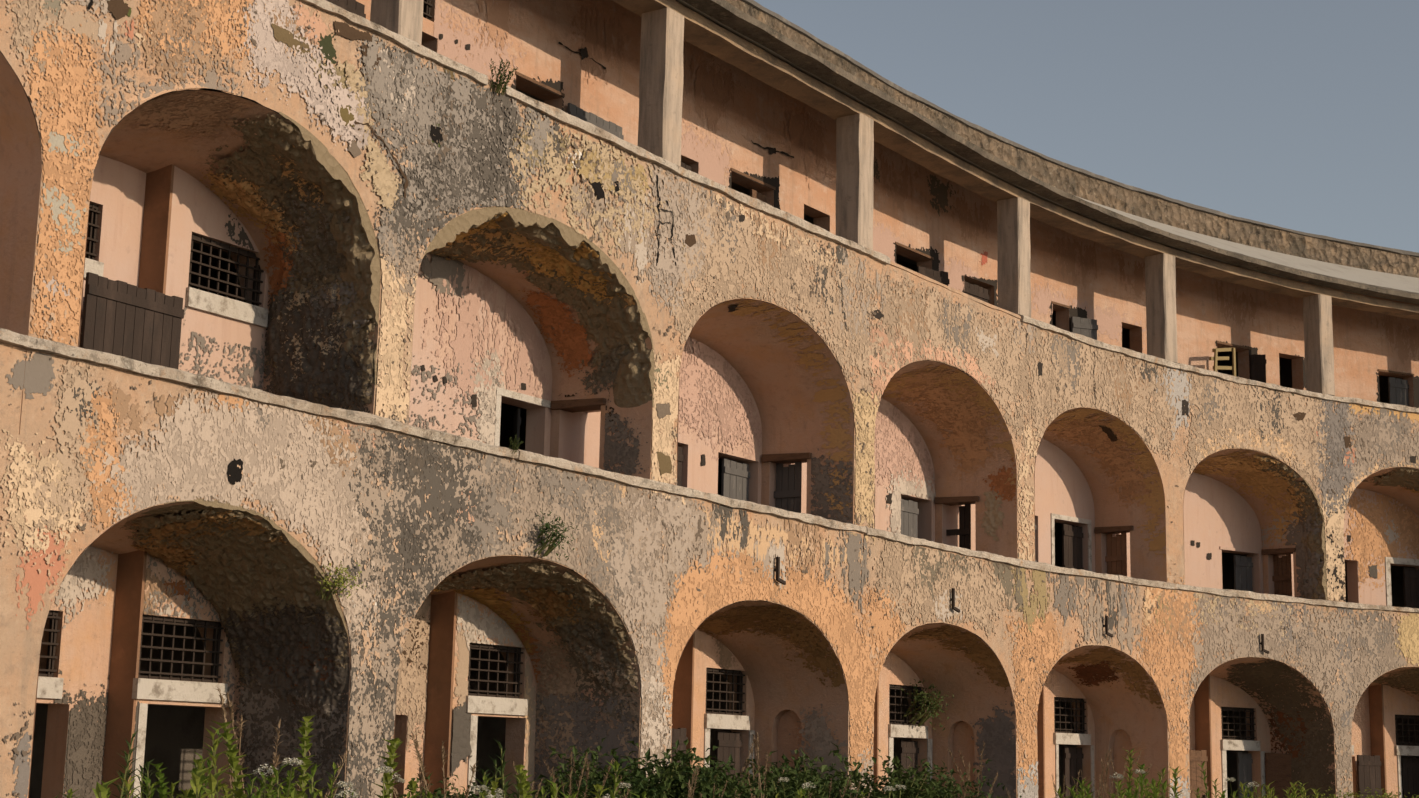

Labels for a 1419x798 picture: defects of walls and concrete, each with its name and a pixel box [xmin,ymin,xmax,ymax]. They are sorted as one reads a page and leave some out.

flaking render [34,273,78,340]
flaking render [41,182,86,256]
spalling [92,0,738,499]
water stain [368,39,573,285]
crack [656,175,676,265]
water stain [143,142,1419,798]
spalling [1118,396,1419,666]
spalling [1369,372,1419,422]